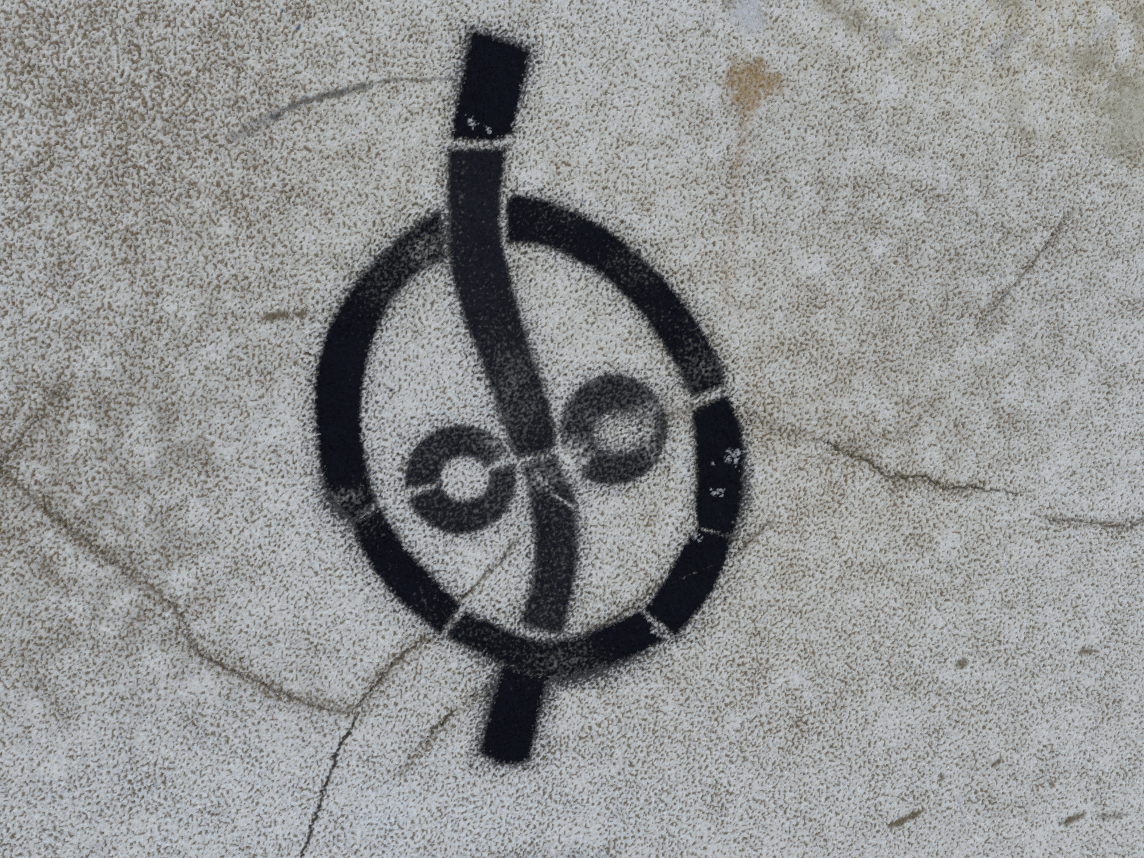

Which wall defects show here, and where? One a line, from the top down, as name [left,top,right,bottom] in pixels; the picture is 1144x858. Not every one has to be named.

rust [726,58,782,109]
crack [824,441,1018,494]
crack [0,394,425,858]
crack [430,711,454,734]